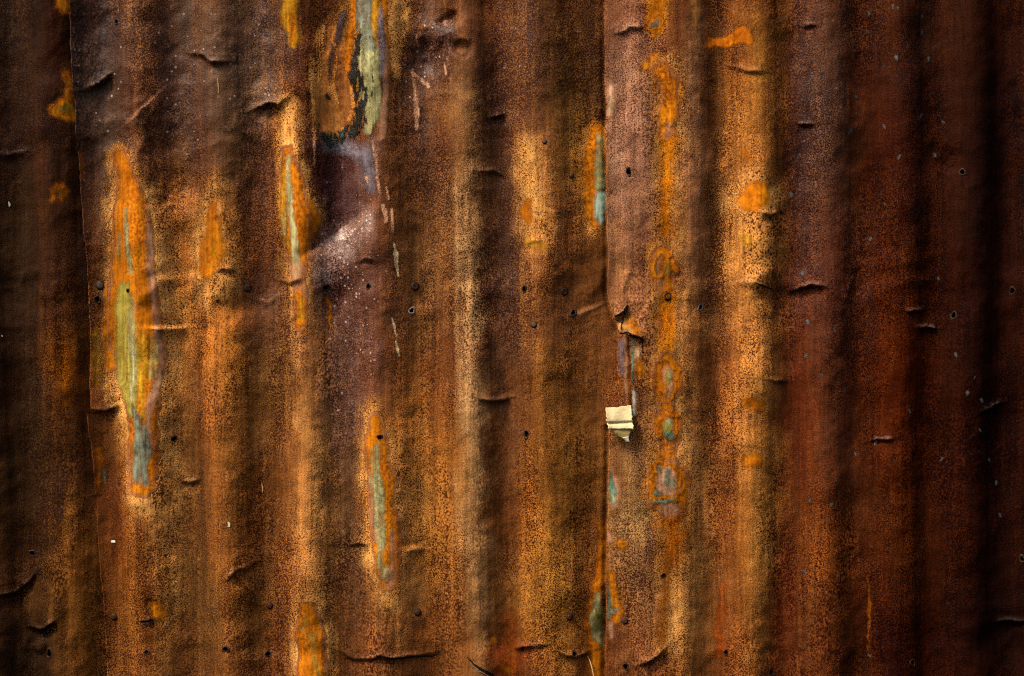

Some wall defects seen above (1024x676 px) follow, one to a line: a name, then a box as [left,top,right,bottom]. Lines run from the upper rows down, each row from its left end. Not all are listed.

rust [706,27,753,48]
rust [274,93,324,332]
rust [579,85,616,238]
rust [96,144,241,520]
rust [618,0,703,654]
rust [290,584,337,676]
rust [357,399,412,614]
rust [586,521,626,676]